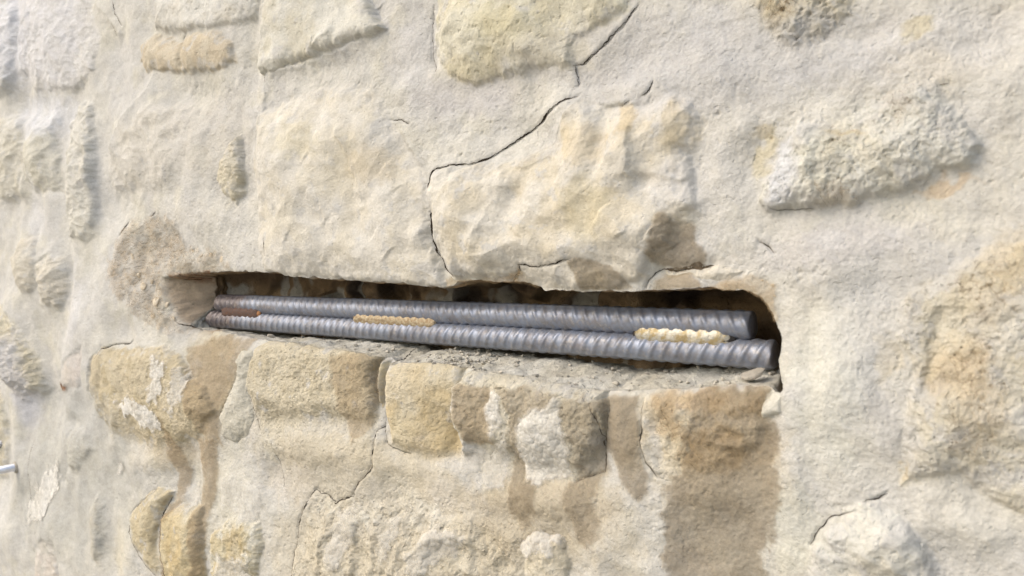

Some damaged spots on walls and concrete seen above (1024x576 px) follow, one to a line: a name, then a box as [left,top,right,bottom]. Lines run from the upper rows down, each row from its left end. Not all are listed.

crack [427,7,637,277]
efflorescence [113,355,187,433]
spalling [741,368,765,382]
crack [291,426,396,575]